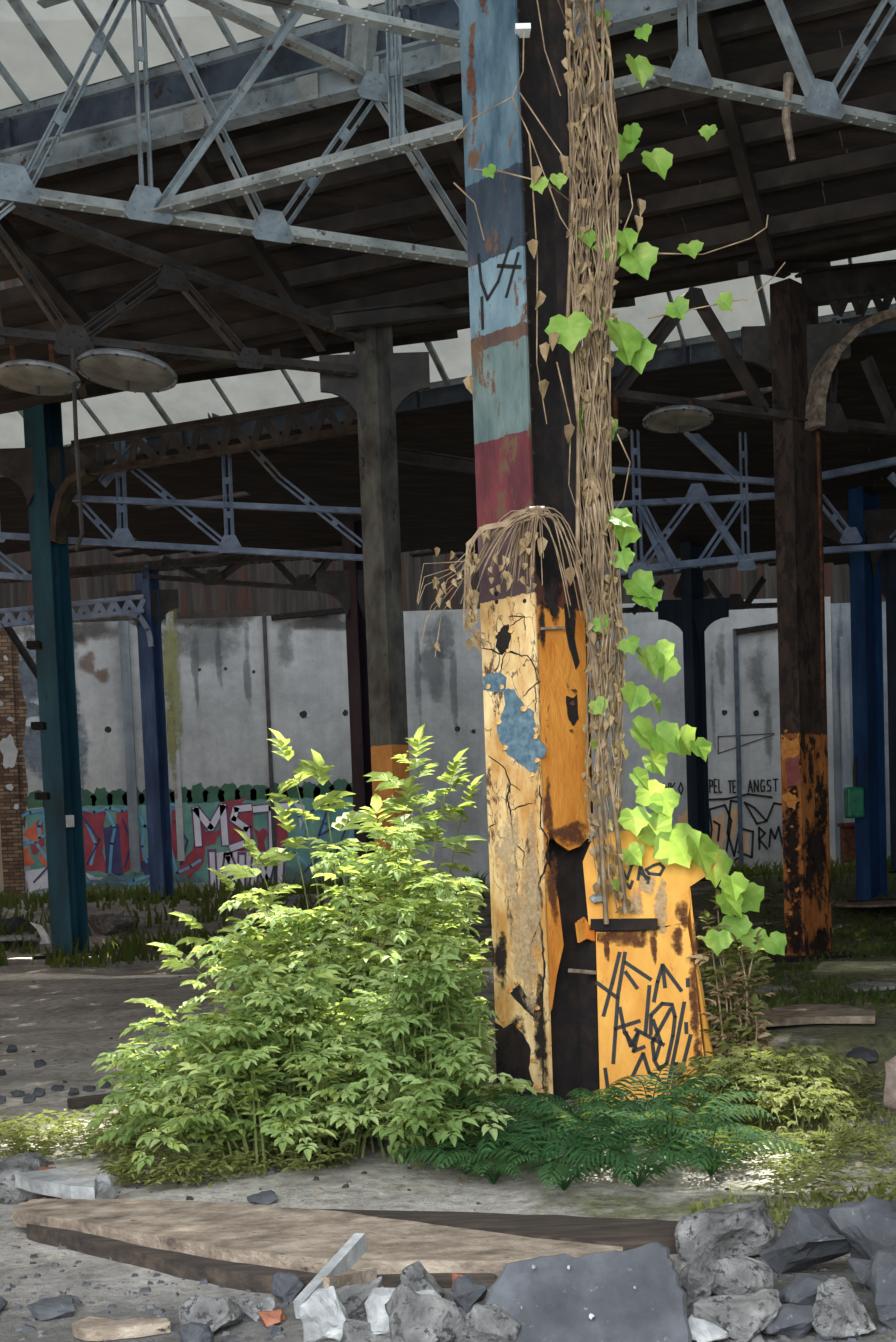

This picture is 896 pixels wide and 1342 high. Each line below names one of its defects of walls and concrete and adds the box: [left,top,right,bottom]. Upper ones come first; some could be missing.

corrosion [467,43,476,102]
peeling [493,624,513,655]
peeling [483,672,546,777]
corrosion [782,784,830,955]
peeling [495,814,541,1101]